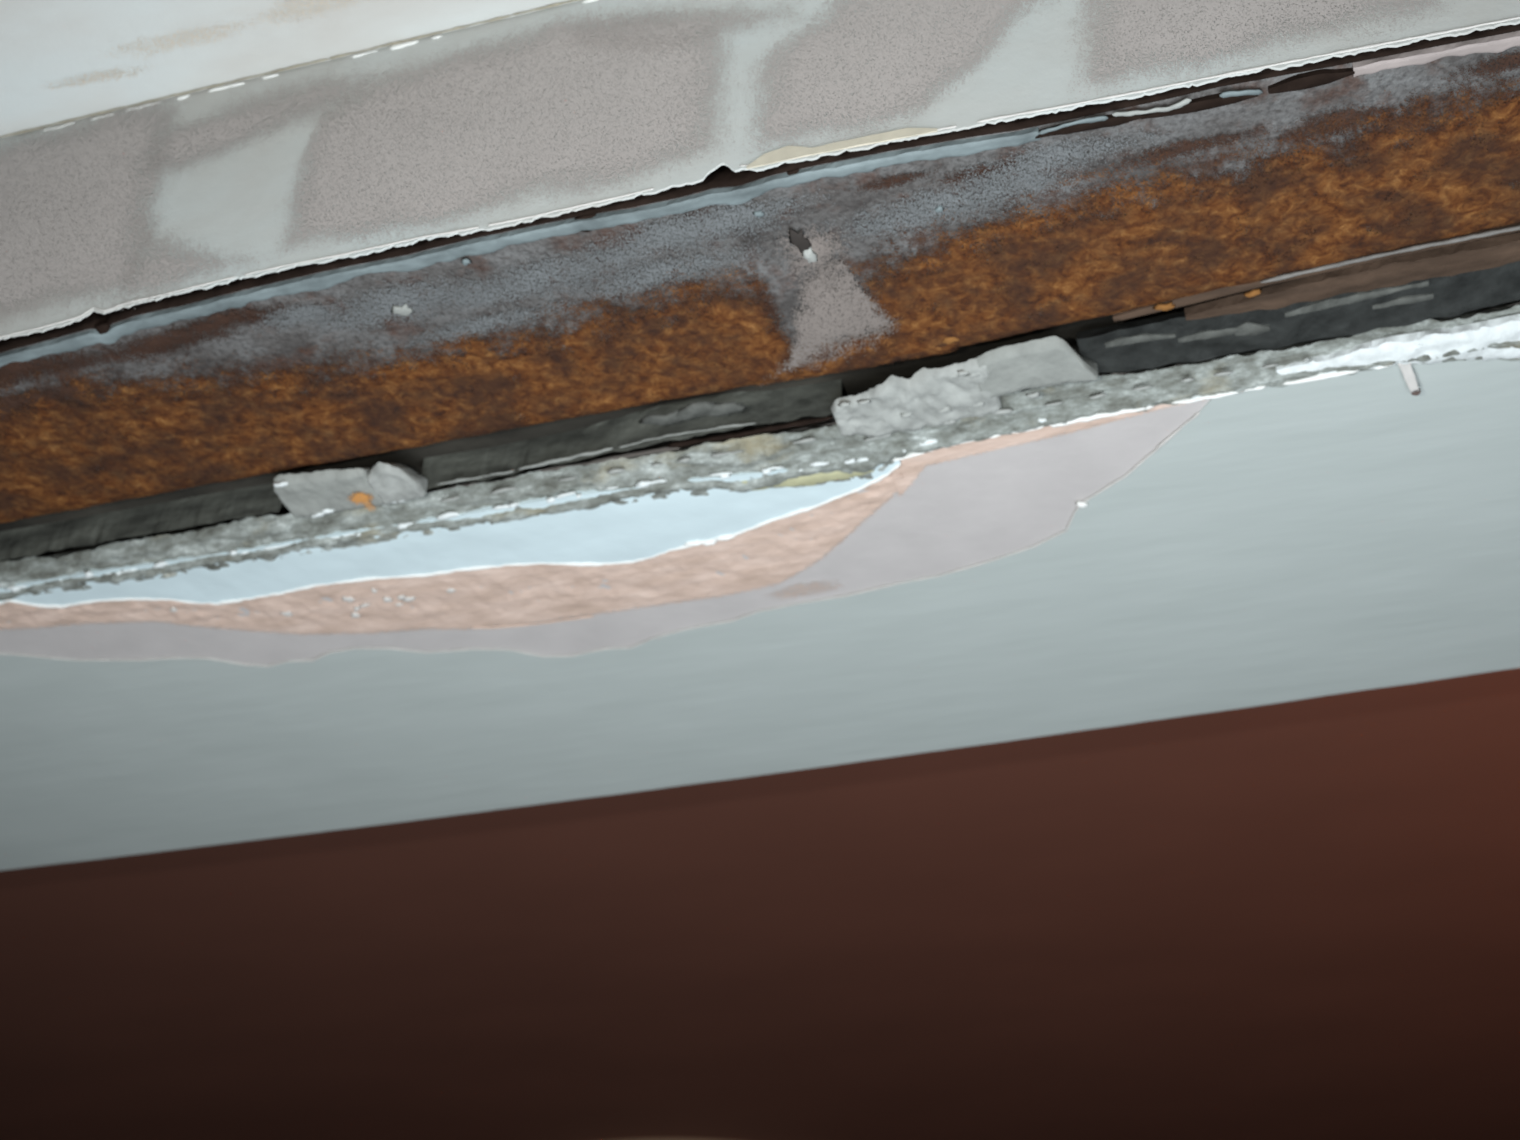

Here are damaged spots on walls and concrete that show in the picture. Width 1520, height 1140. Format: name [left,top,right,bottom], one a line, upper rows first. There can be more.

corrosion [0,48,1520,524]
peeling [0,304,1520,667]